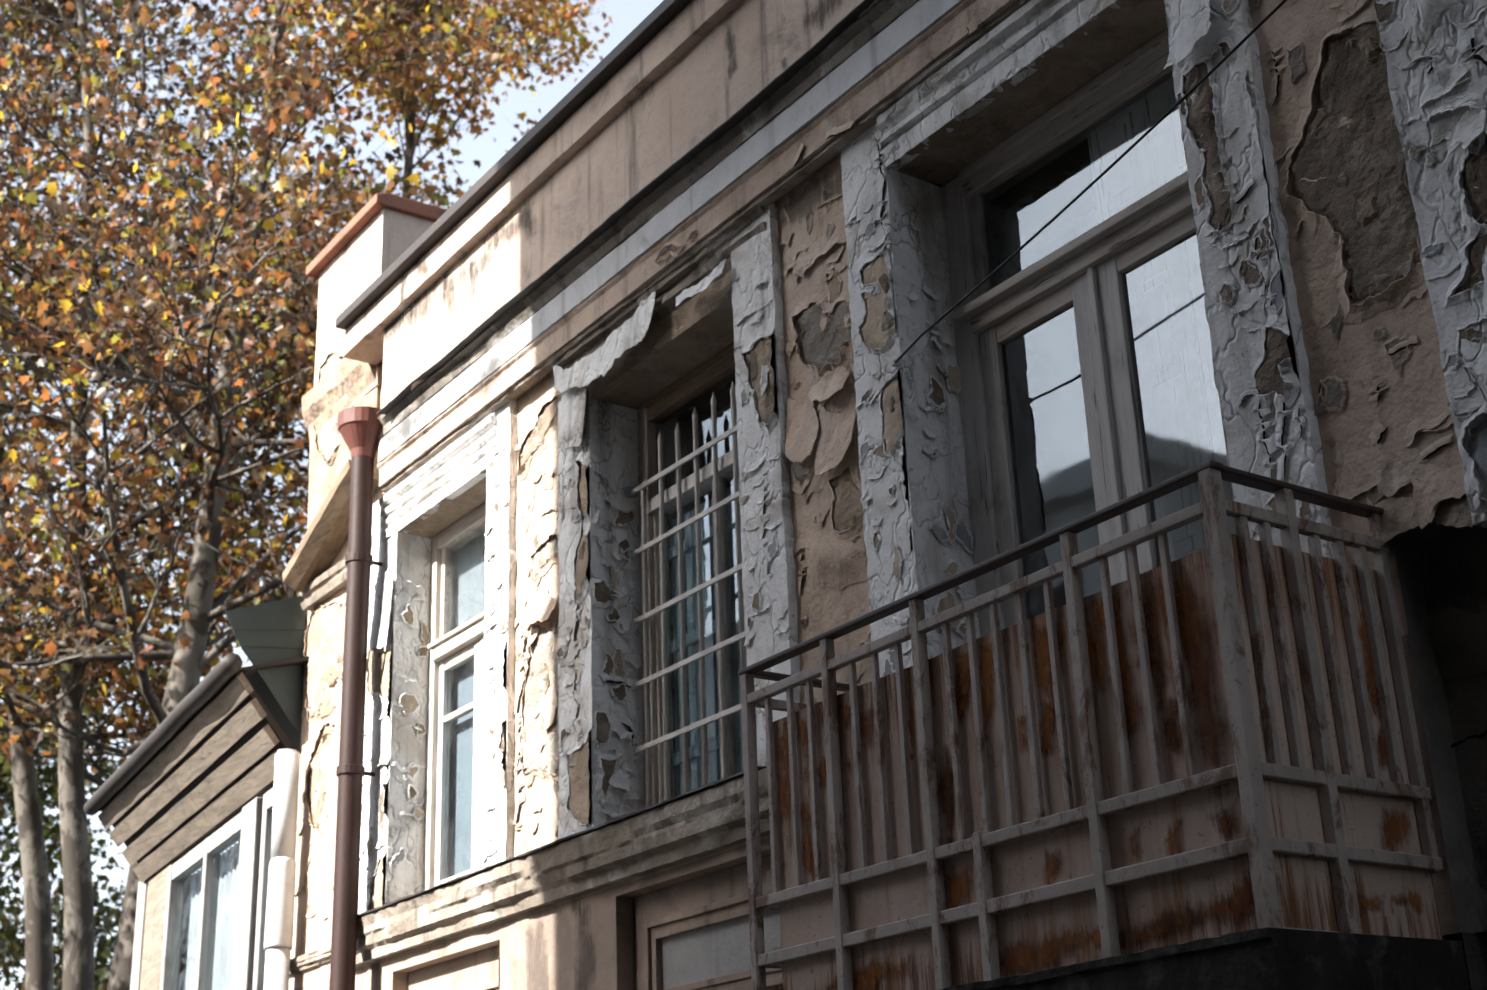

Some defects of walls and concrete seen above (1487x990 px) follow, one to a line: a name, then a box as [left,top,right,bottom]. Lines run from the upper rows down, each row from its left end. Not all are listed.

peeling [675,259,726,307]
flaking render [1163,0,1487,553]
flaking render [733,157,975,646]
peeling [483,292,656,836]
peeling [364,571,430,737]
corrosion [954,643,995,759]
corrosion [1017,621,1062,756]
corrosion [1084,578,1237,842]
corrosion [1360,612,1387,766]
peeling [360,753,427,910]
corrosion [938,747,955,844]
corrosion [1119,872,1254,951]